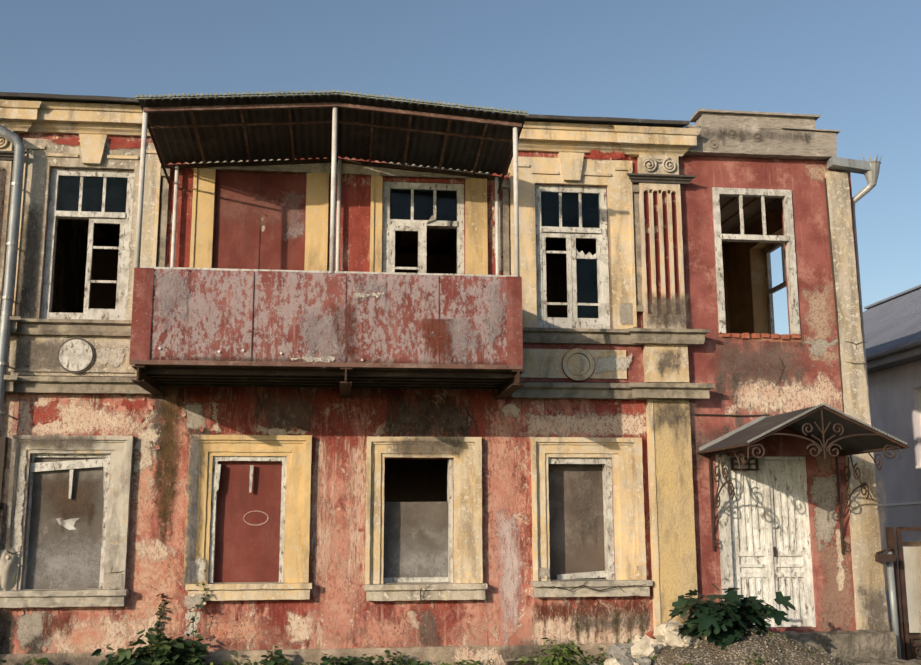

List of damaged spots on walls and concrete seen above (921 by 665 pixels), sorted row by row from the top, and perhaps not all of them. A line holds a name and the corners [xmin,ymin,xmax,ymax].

water stain [16,204,42,317]
peeling [153,267,190,332]
peeling [291,277,386,362]
peeling [438,284,508,362]
water stain [649,296,687,328]
peeling [718,284,838,366]
water stain [385,395,472,456]
peeling [500,401,647,446]
peeling [725,372,843,418]
peeling [0,395,161,566]
water stain [151,398,214,585]
water stain [483,514,649,665]